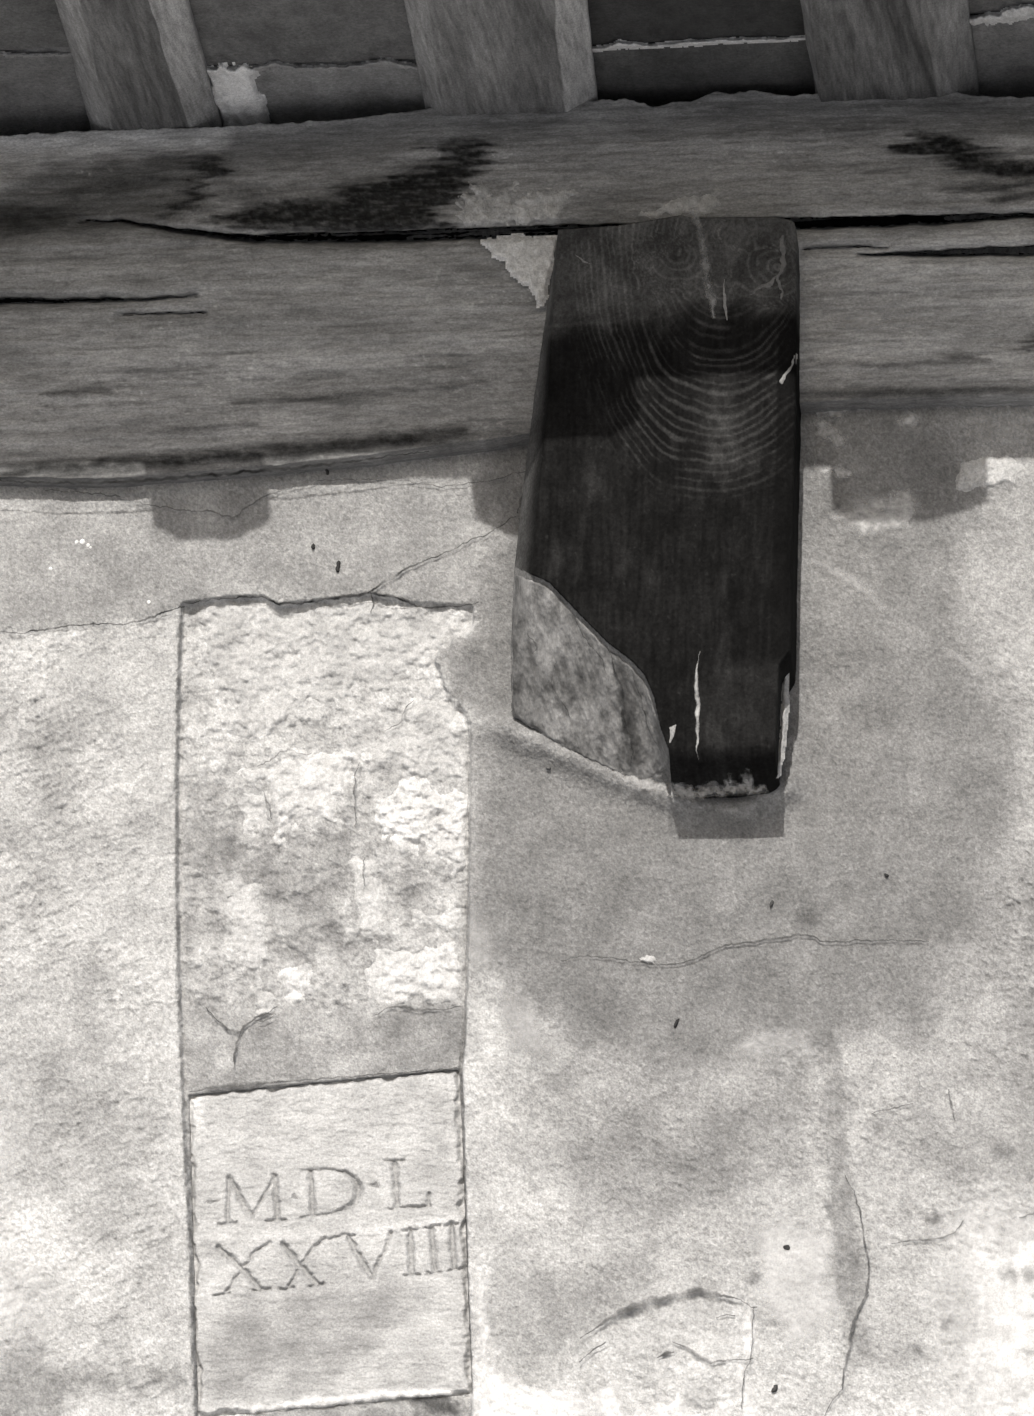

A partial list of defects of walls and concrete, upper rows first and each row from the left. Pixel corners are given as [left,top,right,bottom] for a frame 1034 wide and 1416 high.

damp [216,140,494,232]
flaking render [955,455,1025,492]
crack [0,451,525,687]
crack [561,934,926,965]